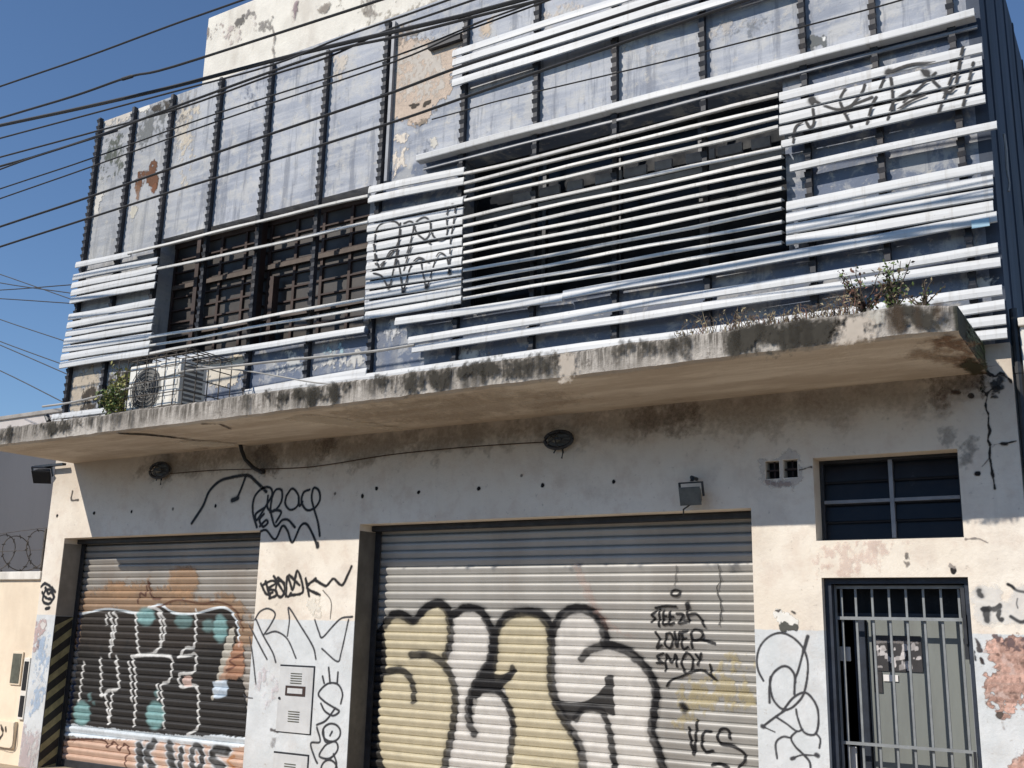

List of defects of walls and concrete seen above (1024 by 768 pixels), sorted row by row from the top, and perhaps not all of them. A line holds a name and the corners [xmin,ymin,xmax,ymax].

peeling [207,10,275,58]
peeling [103,105,150,126]
spalling [384,20,491,178]
corrosion [135,159,159,200]
leakage [613,335,689,357]
leakage [724,318,841,357]
leakage [886,303,950,332]
leakage [374,352,558,398]
leakage [264,381,361,427]
crack [982,370,1016,490]
peeling [773,609,798,632]
spalling [974,634,1024,720]